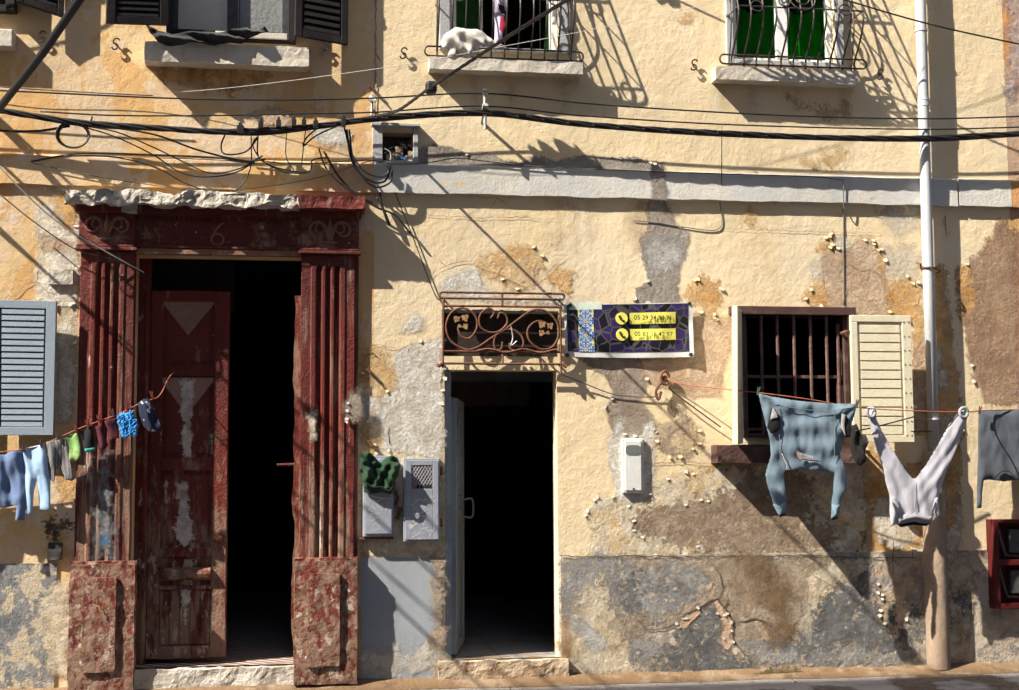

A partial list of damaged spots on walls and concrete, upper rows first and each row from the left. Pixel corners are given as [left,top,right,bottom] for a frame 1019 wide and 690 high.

peeling [475,240,576,296]
peeling [801,218,1019,440]
peeling [342,334,447,458]
spalling [555,271,925,674]
peeling [945,430,966,532]
peeling [37,573,70,676]
crack [560,540,917,655]